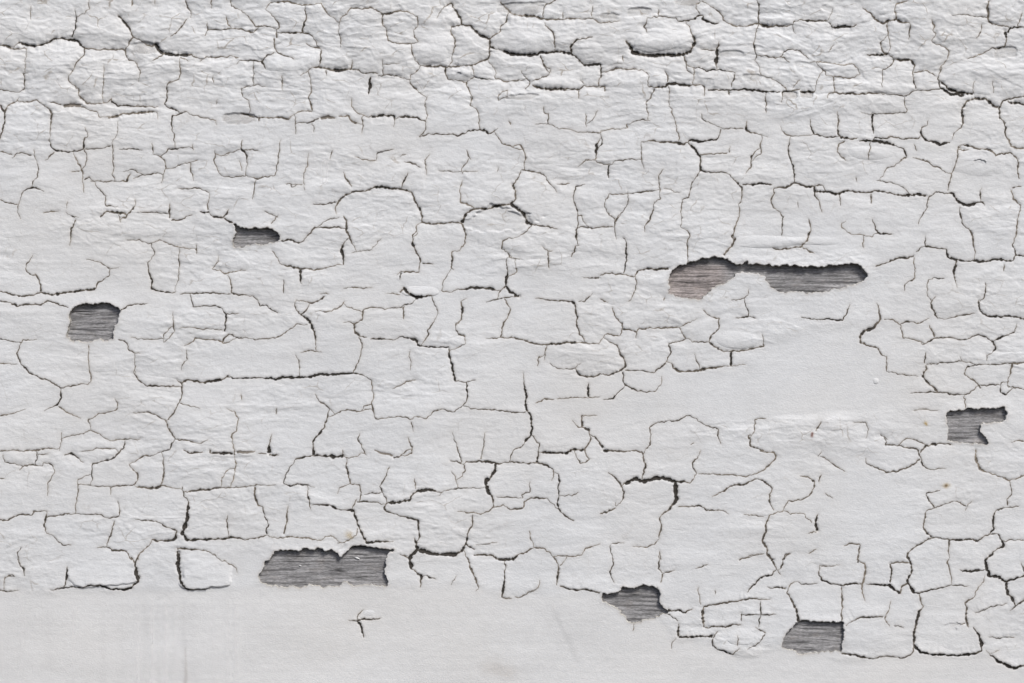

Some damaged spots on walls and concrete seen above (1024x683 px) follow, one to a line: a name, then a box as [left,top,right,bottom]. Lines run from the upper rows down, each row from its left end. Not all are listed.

crack [0,0,1024,408]
peeling [232,223,280,248]
peeling [668,256,868,300]
peeling [66,302,121,343]
crack [0,239,821,655]
crack [854,422,951,473]
peeling [946,407,1007,445]
peeling [258,545,394,589]
crack [769,450,1024,669]
peeling [601,584,668,623]
peeling [781,620,845,655]